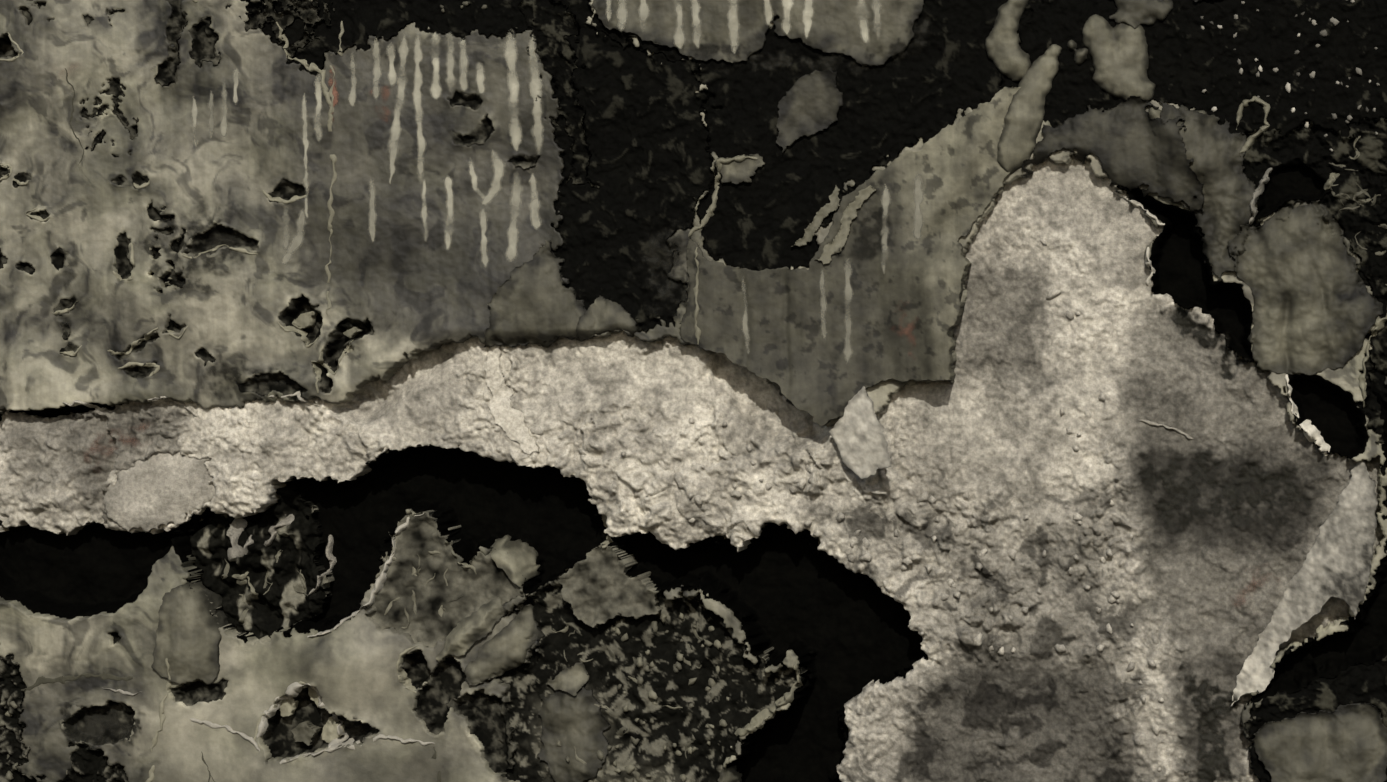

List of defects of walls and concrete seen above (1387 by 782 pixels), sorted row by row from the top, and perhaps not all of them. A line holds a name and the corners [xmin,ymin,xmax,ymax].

water stain [282,81,322,264]
water stain [369,33,484,249]
water stain [470,153,540,266]
water stain [505,37,542,151]
peeling [241,0,1020,348]
water stain [654,0,842,71]
peeling [679,87,1021,426]
peeling [1017,0,1126,128]
peeling [1141,0,1387,443]
spalling [0,410,118,536]
spalling [75,155,1387,782]
crack [21,658,441,782]